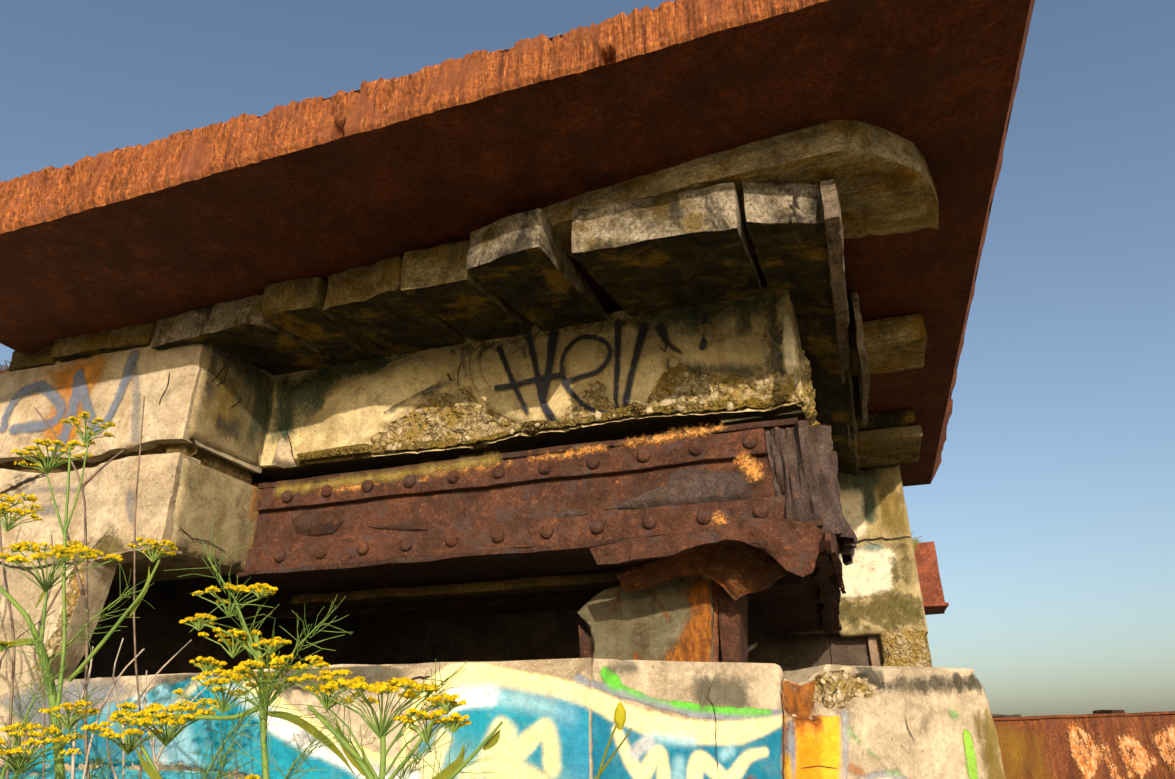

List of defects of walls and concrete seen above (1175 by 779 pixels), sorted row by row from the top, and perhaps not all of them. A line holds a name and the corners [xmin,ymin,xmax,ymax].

rust [45,355,103,441]
water stain [203,343,414,442]
spalling [297,314,820,461]
peeling [734,453,762,482]
rust [765,420,858,566]
rust [661,577,712,662]
water stain [839,543,925,630]
rust [1066,722,1175,779]